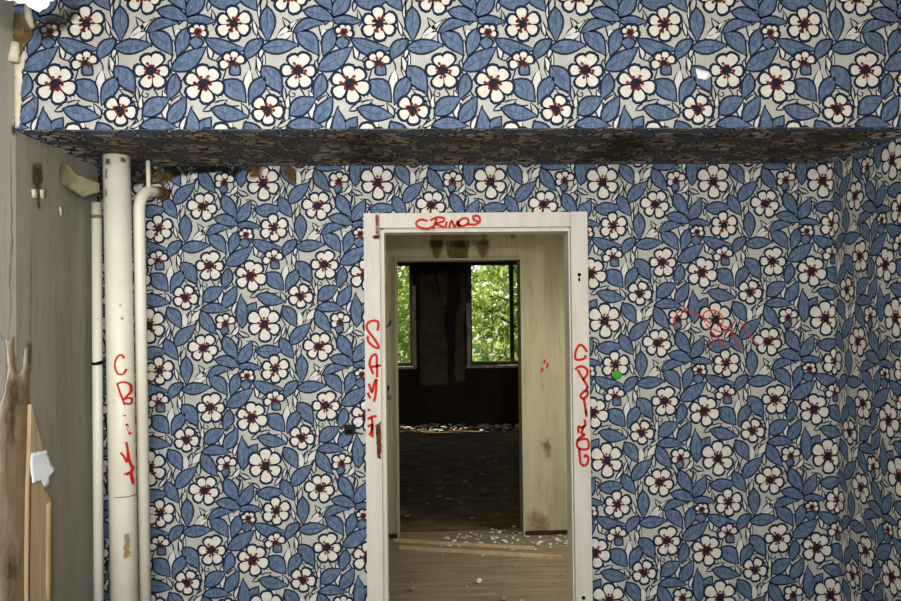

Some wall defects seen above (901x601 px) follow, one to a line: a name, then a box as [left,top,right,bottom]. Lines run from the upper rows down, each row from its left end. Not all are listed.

spalling [7,0,78,128]
peeling [0,337,55,601]